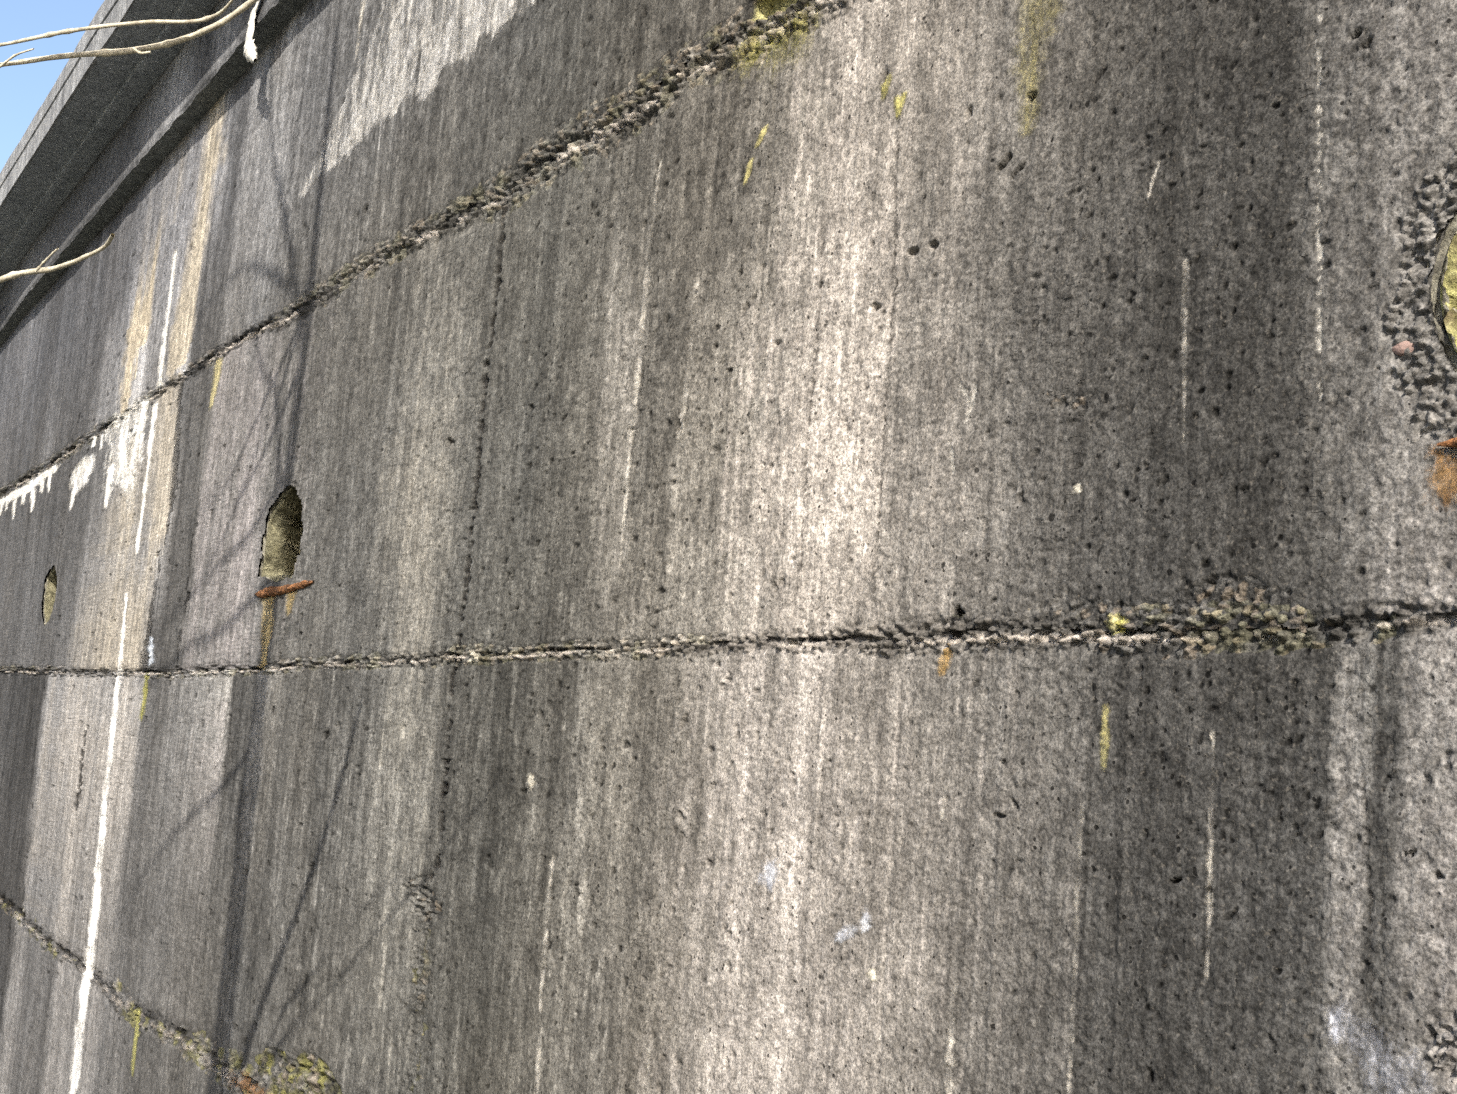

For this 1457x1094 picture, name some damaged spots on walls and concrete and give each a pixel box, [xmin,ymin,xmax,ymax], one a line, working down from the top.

crack [0,0,840,879]
crack [949,383,977,472]
corrosion [1433,437,1457,504]
leakage [0,0,342,1094]
leakage [579,0,1101,1094]
leakage [1297,0,1457,1094]
corrosion [255,580,314,669]
crack [775,637,852,647]
crack [898,600,1439,660]